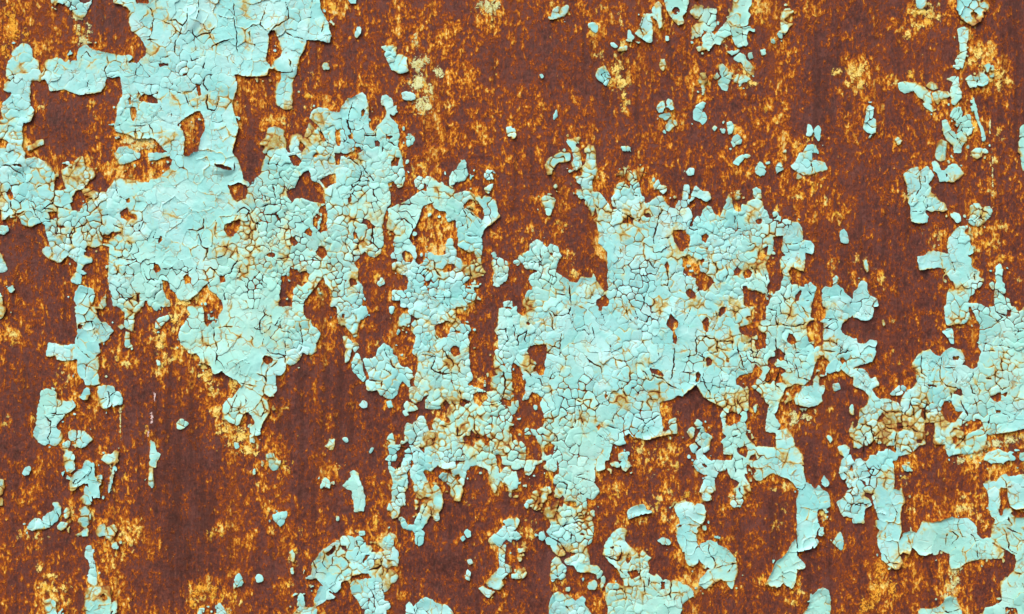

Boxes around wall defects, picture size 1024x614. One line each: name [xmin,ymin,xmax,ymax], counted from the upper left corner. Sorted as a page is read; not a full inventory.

crack [147,2,303,53]
rust [408,33,444,115]
rust [607,60,628,112]
peeling [610,0,828,179]
rust [968,41,1013,89]
peeling [897,76,991,224]
crack [188,220,238,292]
crack [516,286,594,349]
crack [685,336,718,368]
rust [198,363,260,458]
peeling [33,387,122,549]
peeling [290,527,399,614]